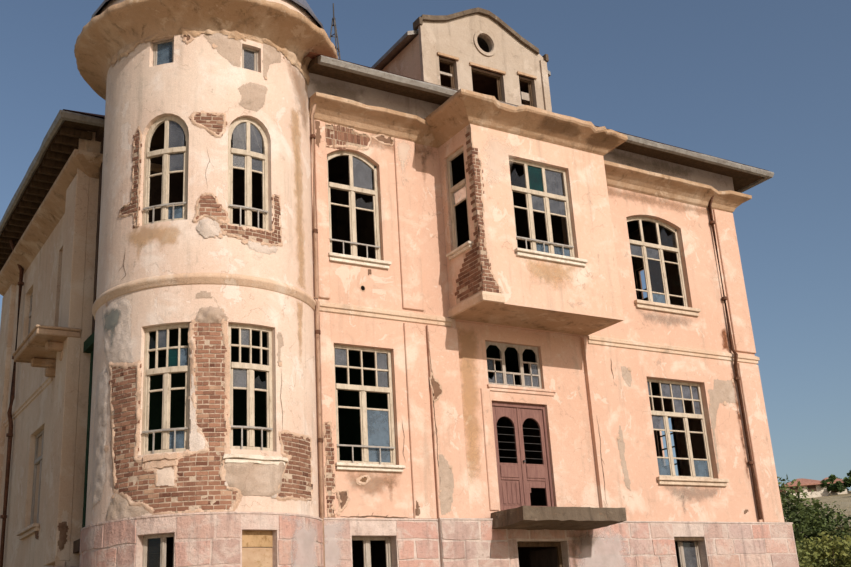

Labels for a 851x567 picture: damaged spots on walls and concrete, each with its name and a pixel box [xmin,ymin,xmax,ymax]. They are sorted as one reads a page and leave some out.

flaking render [118,126,142,228]
flaking render [189,110,227,138]
flaking render [192,192,283,254]
flaking render [315,120,394,151]
flaking render [455,125,504,304]
flaking render [92,298,243,515]
flaking render [275,430,313,501]
spalling [323,421,350,517]